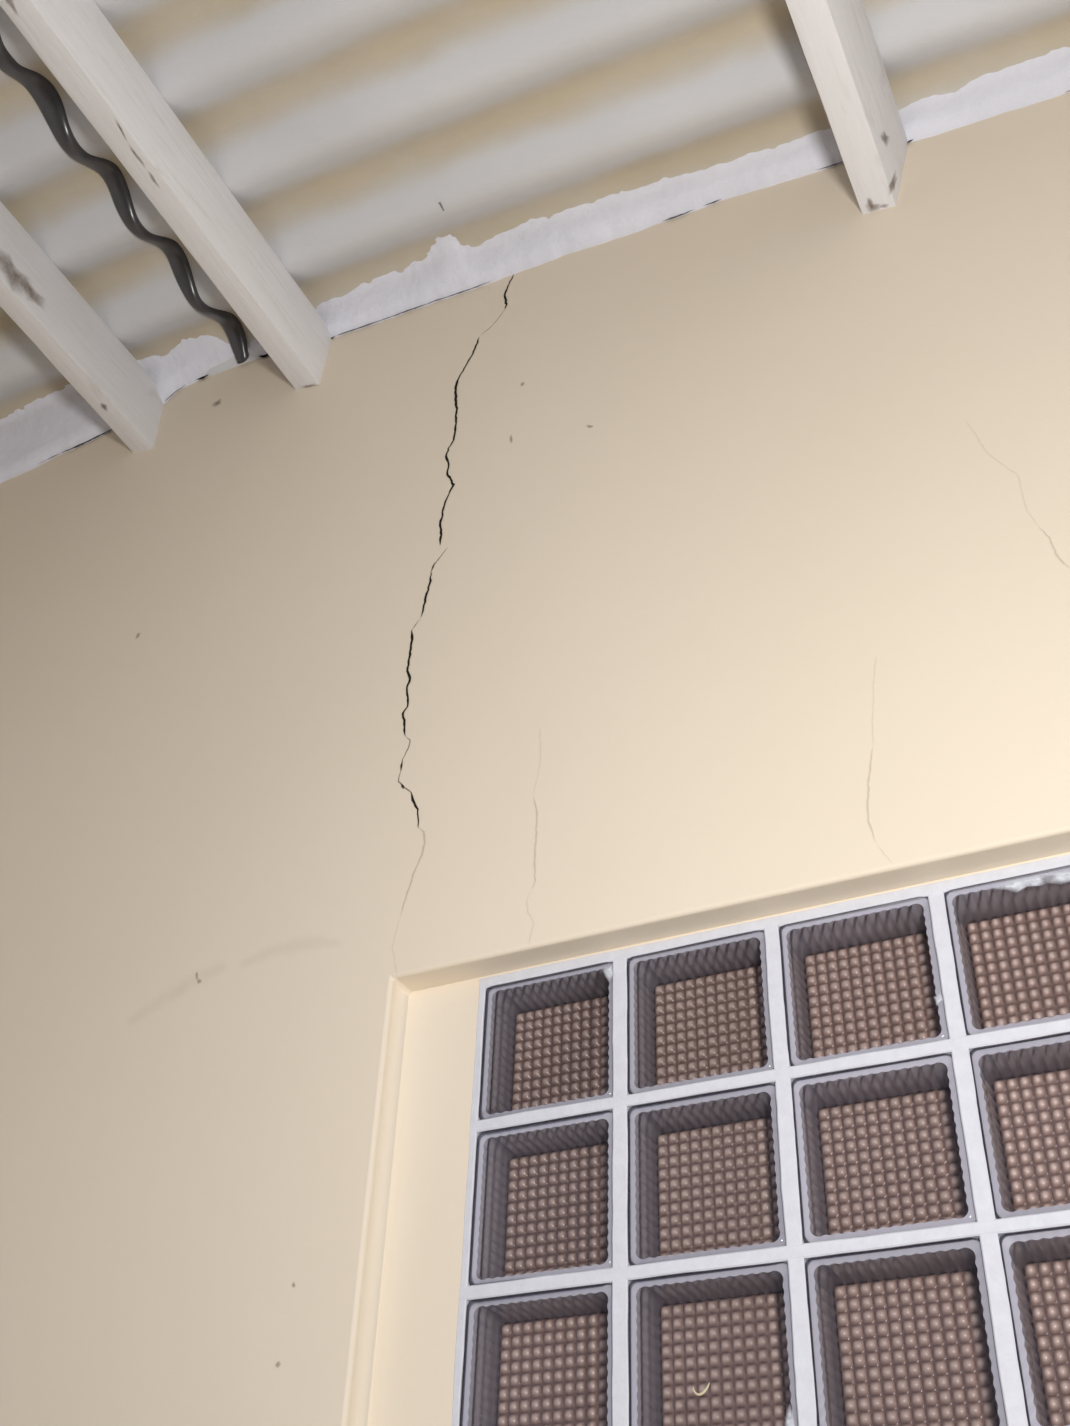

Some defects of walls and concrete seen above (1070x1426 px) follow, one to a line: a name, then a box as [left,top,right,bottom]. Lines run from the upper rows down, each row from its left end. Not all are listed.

crack [331,275,514,825]